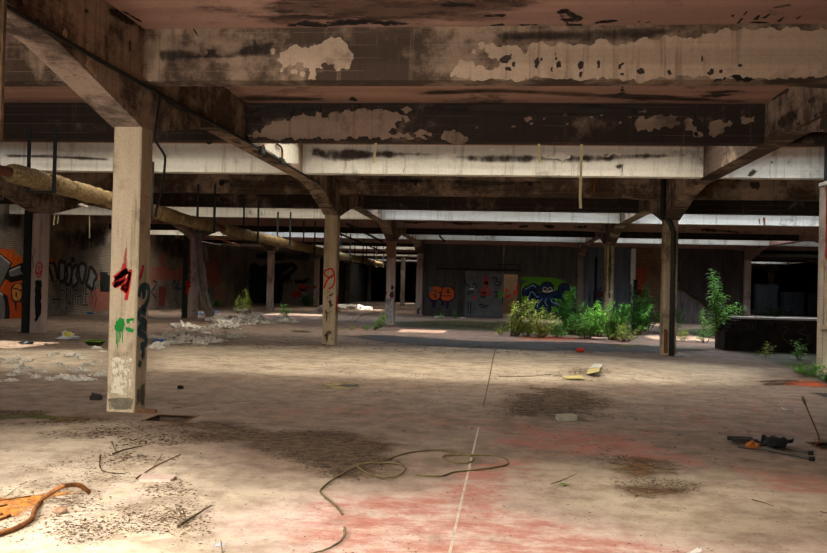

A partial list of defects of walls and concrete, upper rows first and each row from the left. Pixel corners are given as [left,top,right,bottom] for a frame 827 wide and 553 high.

leakage [268,0,668,40]
peeling [270,36,354,80]
peeling [450,26,827,84]
peeling [232,106,469,168]
peeling [619,109,755,138]